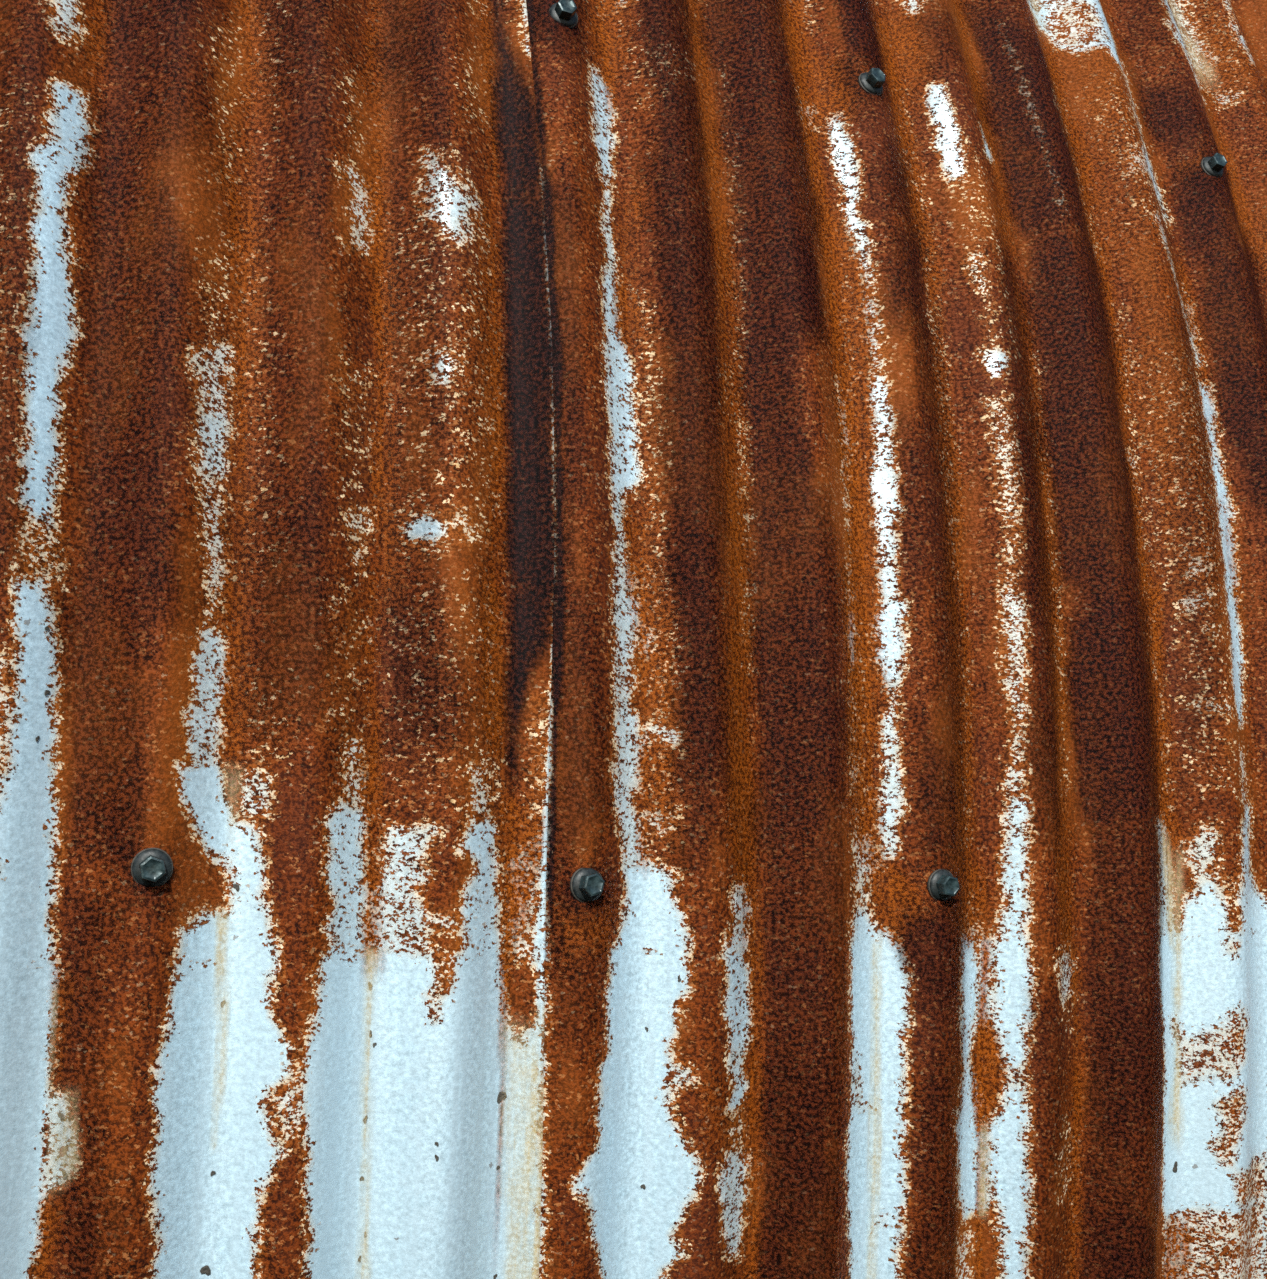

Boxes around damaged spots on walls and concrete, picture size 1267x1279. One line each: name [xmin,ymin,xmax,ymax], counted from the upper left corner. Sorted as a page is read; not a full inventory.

corrosion [525,167,544,203]
corrosion [1107,0,1267,912]
corrosion [196,918,226,973]
corrosion [1169,1001,1250,1169]